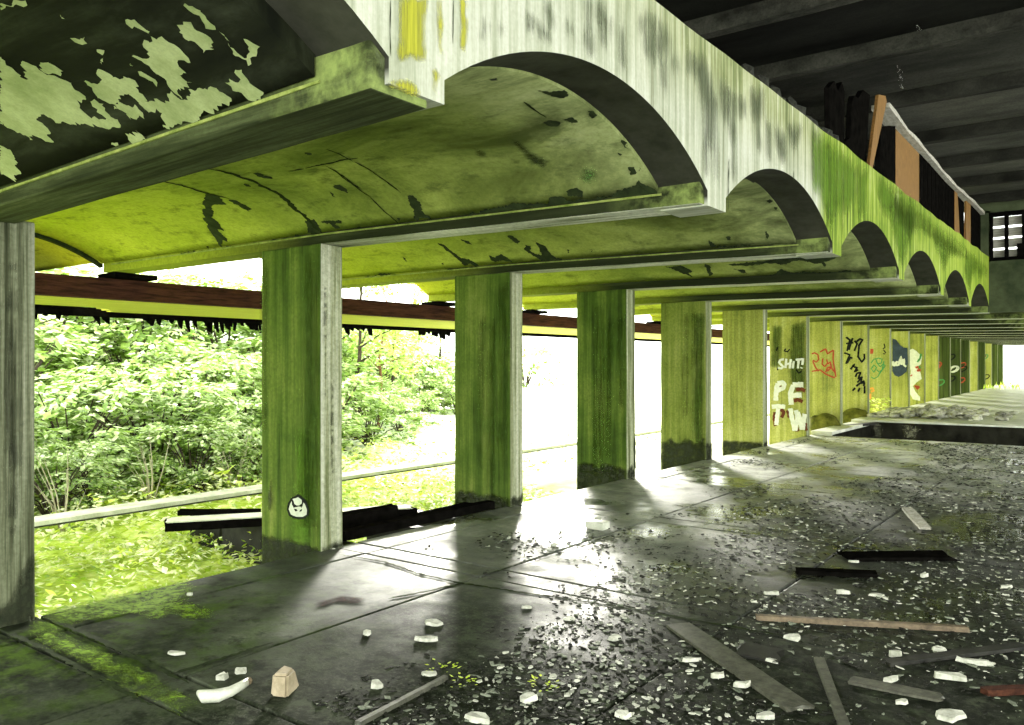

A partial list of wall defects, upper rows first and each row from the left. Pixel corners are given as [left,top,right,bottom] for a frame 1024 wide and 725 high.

peeling [0,4,264,146]
damp [690,57,761,167]
peeling [0,145,21,182]
crack [166,169,323,233]
crack [291,149,399,224]
peeling [461,167,657,217]
damp [812,132,915,263]
peeling [728,257,851,276]
damp [928,227,987,289]
damp [576,319,636,490]
damp [660,315,768,470]
spalling [832,422,1024,446]